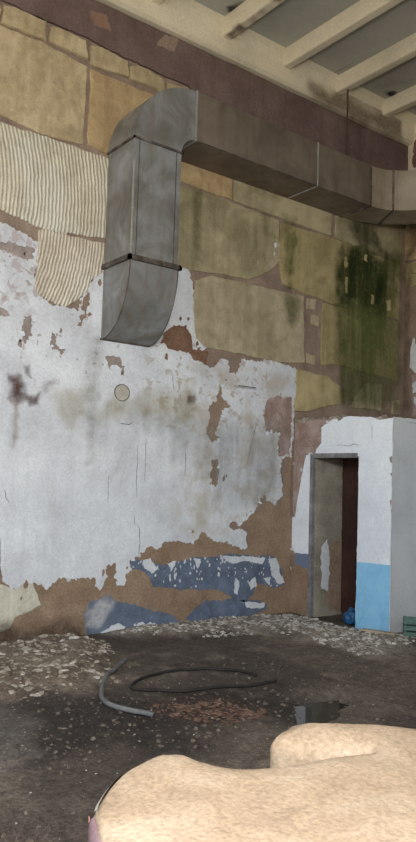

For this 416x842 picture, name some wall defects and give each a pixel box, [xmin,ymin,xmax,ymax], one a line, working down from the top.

peeling [0,241,36,261]
damp [339,250,384,303]
peeling [18,316,34,348]
peeling [50,328,65,356]
peeling [77,292,92,326]
flaking render [160,317,216,365]
flaking render [405,260,416,417]
peeling [206,379,230,443]
flaking render [0,393,332,640]
peeling [88,757,155,842]